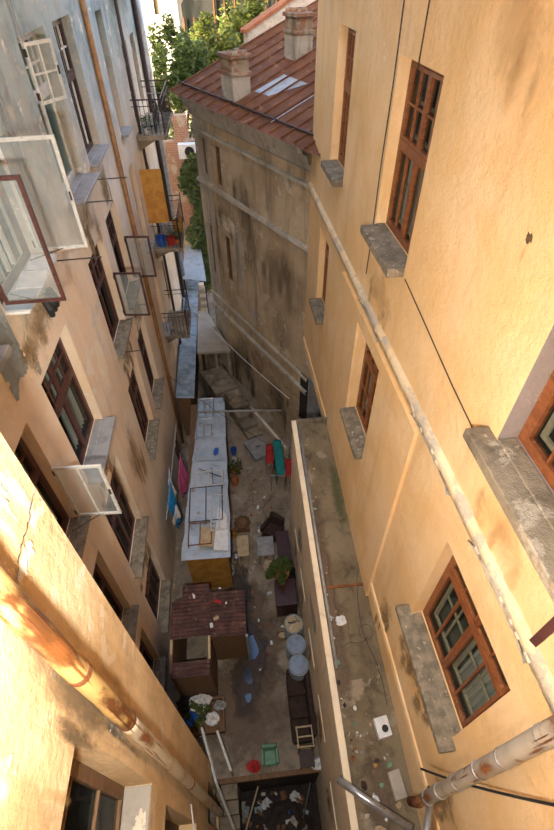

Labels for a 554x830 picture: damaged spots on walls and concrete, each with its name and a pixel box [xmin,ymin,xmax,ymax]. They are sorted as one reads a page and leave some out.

flaking render [0,307,43,402]
crack [17,494,34,571]
flaking render [17,540,34,583]
corrosion [0,589,94,682]
flaking render [132,808,146,830]